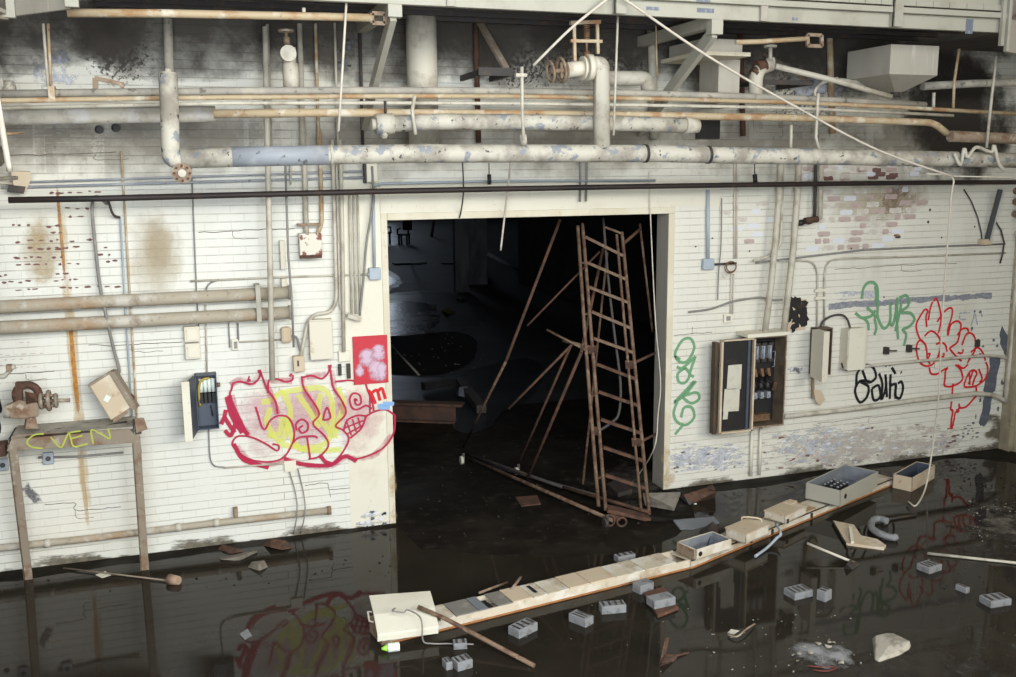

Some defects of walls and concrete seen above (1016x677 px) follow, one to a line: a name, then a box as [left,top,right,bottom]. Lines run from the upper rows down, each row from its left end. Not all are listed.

rust [57,194,65,273]
flaking render [802,165,931,251]
rust [69,331,79,407]
spalling [761,326,1008,474]
peeling [669,443,745,473]